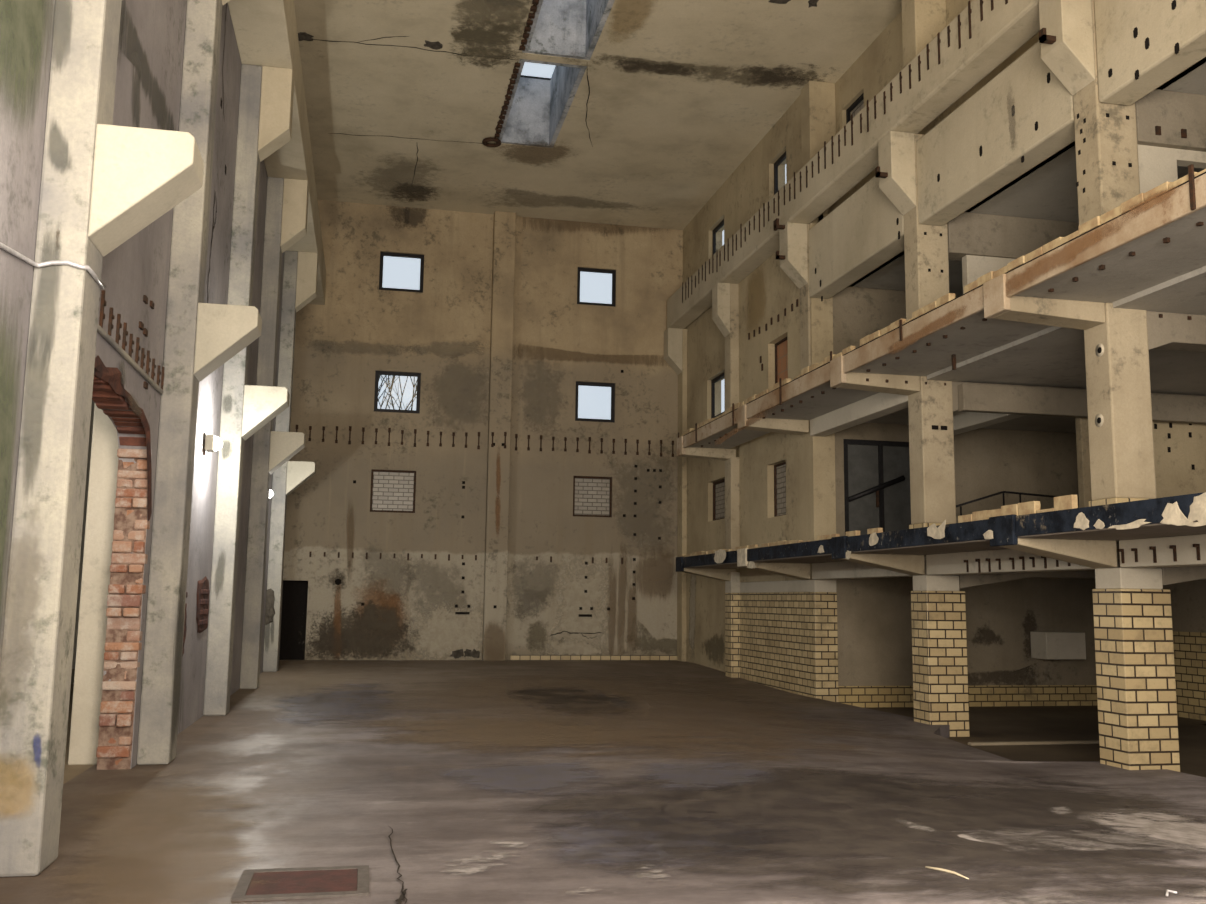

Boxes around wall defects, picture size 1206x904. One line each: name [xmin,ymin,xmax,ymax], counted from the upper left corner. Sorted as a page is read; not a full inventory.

leakage [118,3,174,131]
leakage [452,0,527,67]
leakage [602,56,815,88]
peeling [869,532,879,546]
peeling [927,520,946,539]
peeling [1074,492,1206,530]
corrosion [329,569,345,656]
crack [388,827,408,904]